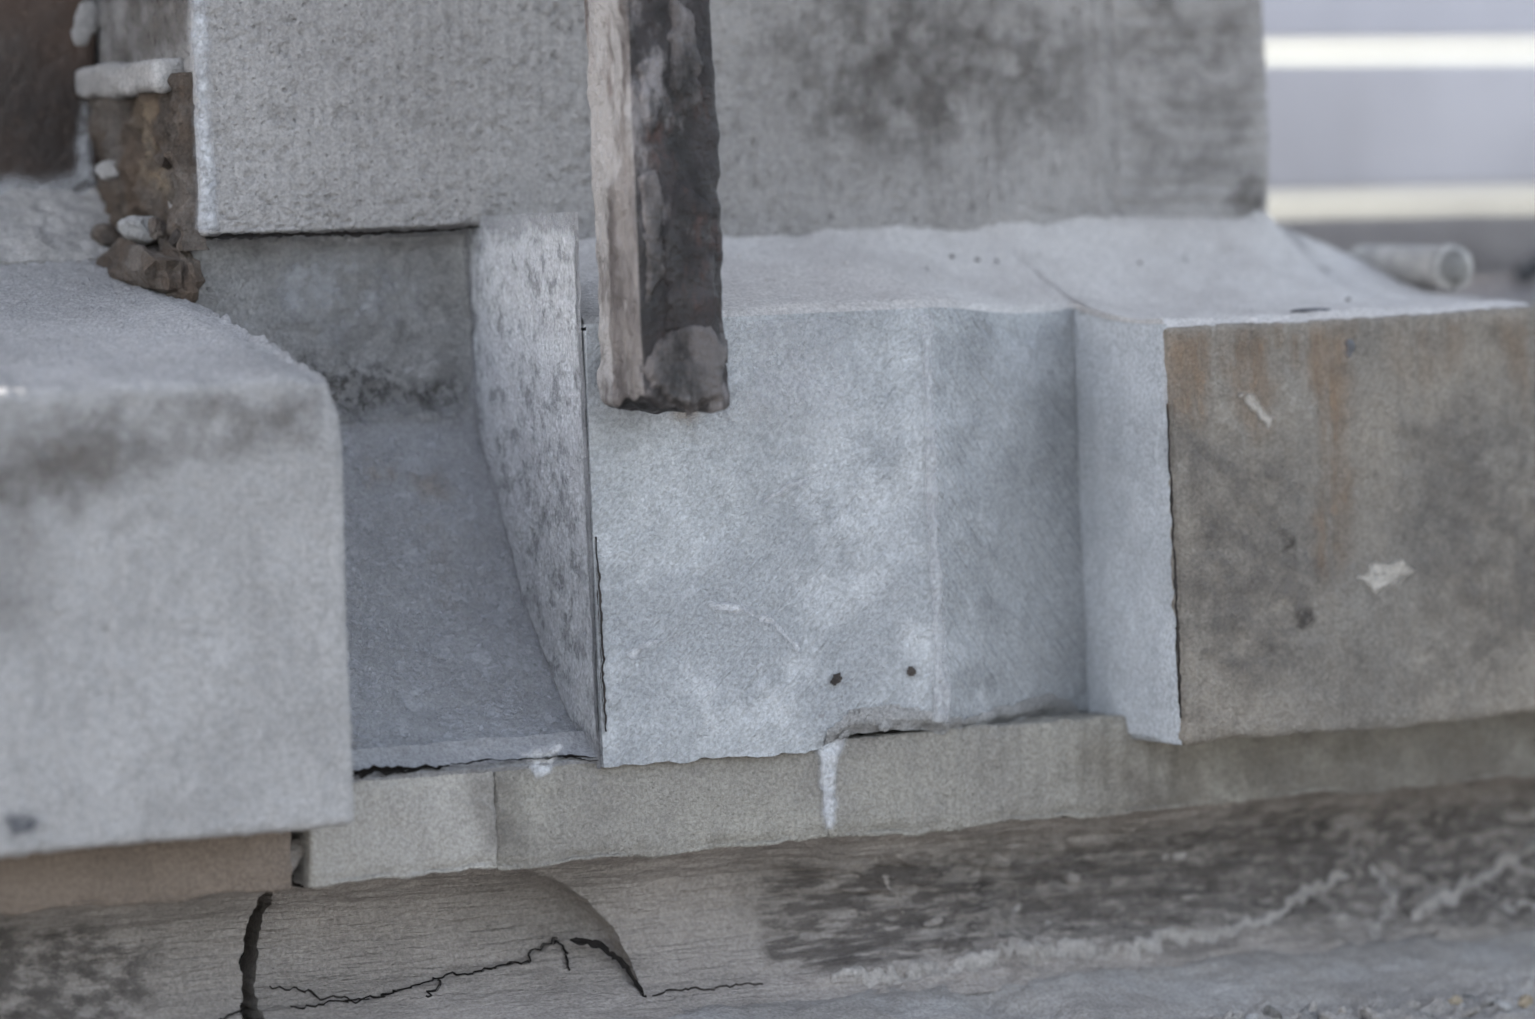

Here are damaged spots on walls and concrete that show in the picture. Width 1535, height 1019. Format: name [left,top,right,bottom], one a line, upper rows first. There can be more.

rust [635,0,703,143]
rust [639,325,728,416]
crack [290,831,304,888]
crack [219,937,763,1019]